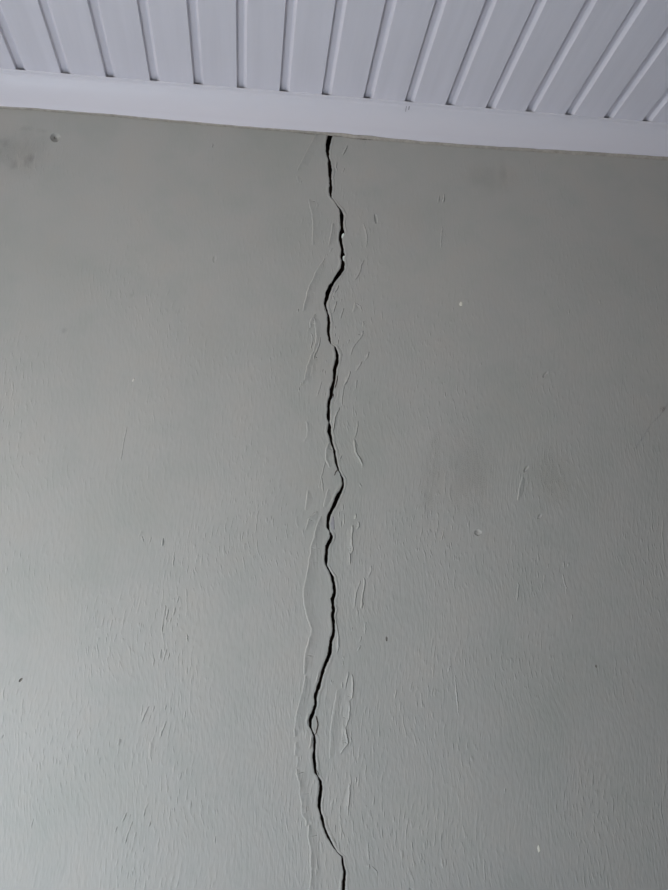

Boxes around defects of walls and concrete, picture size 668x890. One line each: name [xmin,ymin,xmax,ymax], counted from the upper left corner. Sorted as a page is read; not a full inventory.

crack [305,135,350,890]